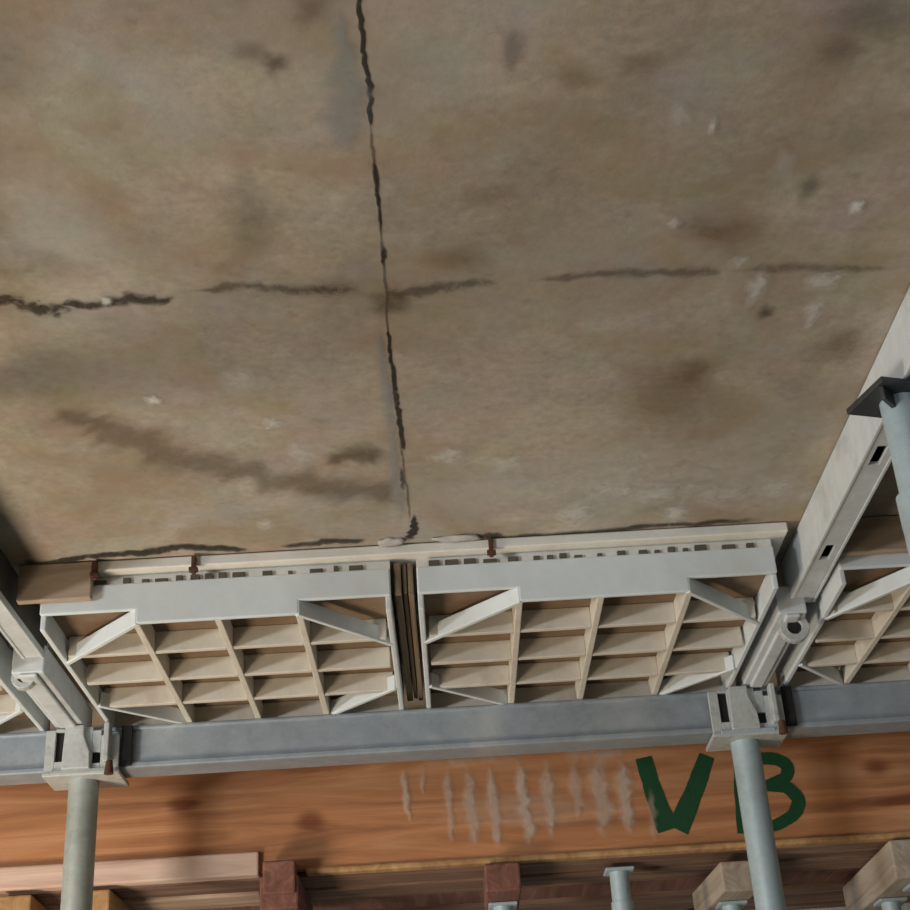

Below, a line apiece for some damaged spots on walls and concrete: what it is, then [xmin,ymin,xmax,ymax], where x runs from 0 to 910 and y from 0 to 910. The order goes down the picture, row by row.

crack [356,0,374,125]
crack [373,164,386,265]
crack [0,293,169,317]
crack [386,331,405,449]
crack [405,517,418,539]
leakage [517,770,534,835]
leakage [619,768,632,824]